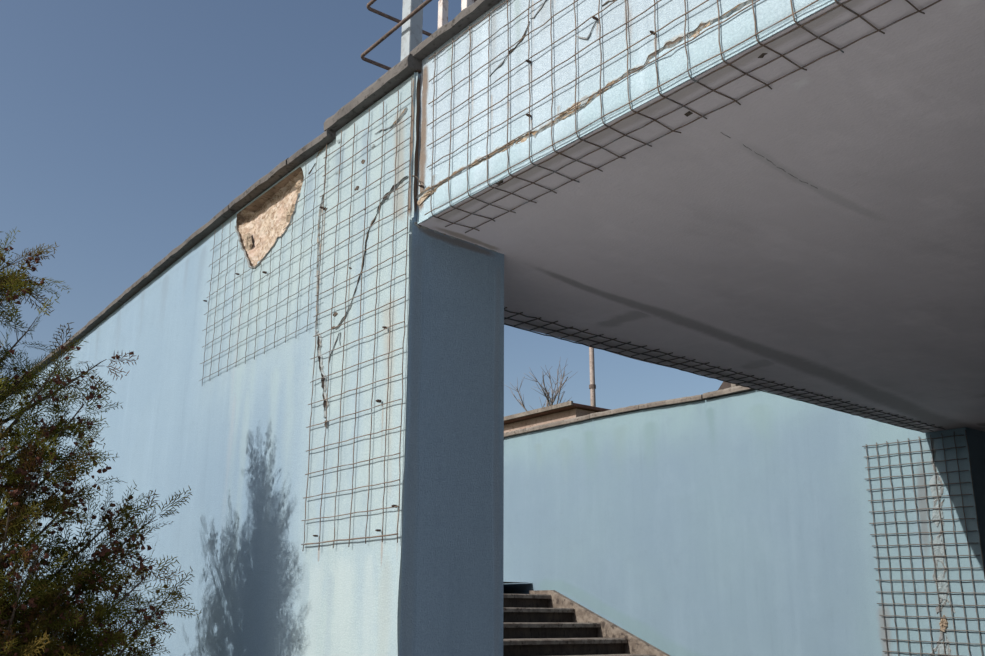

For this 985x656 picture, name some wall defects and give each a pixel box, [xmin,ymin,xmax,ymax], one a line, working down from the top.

crack [308,0,755,428]
spalling [199,0,942,551]
crack [929,439,955,656]